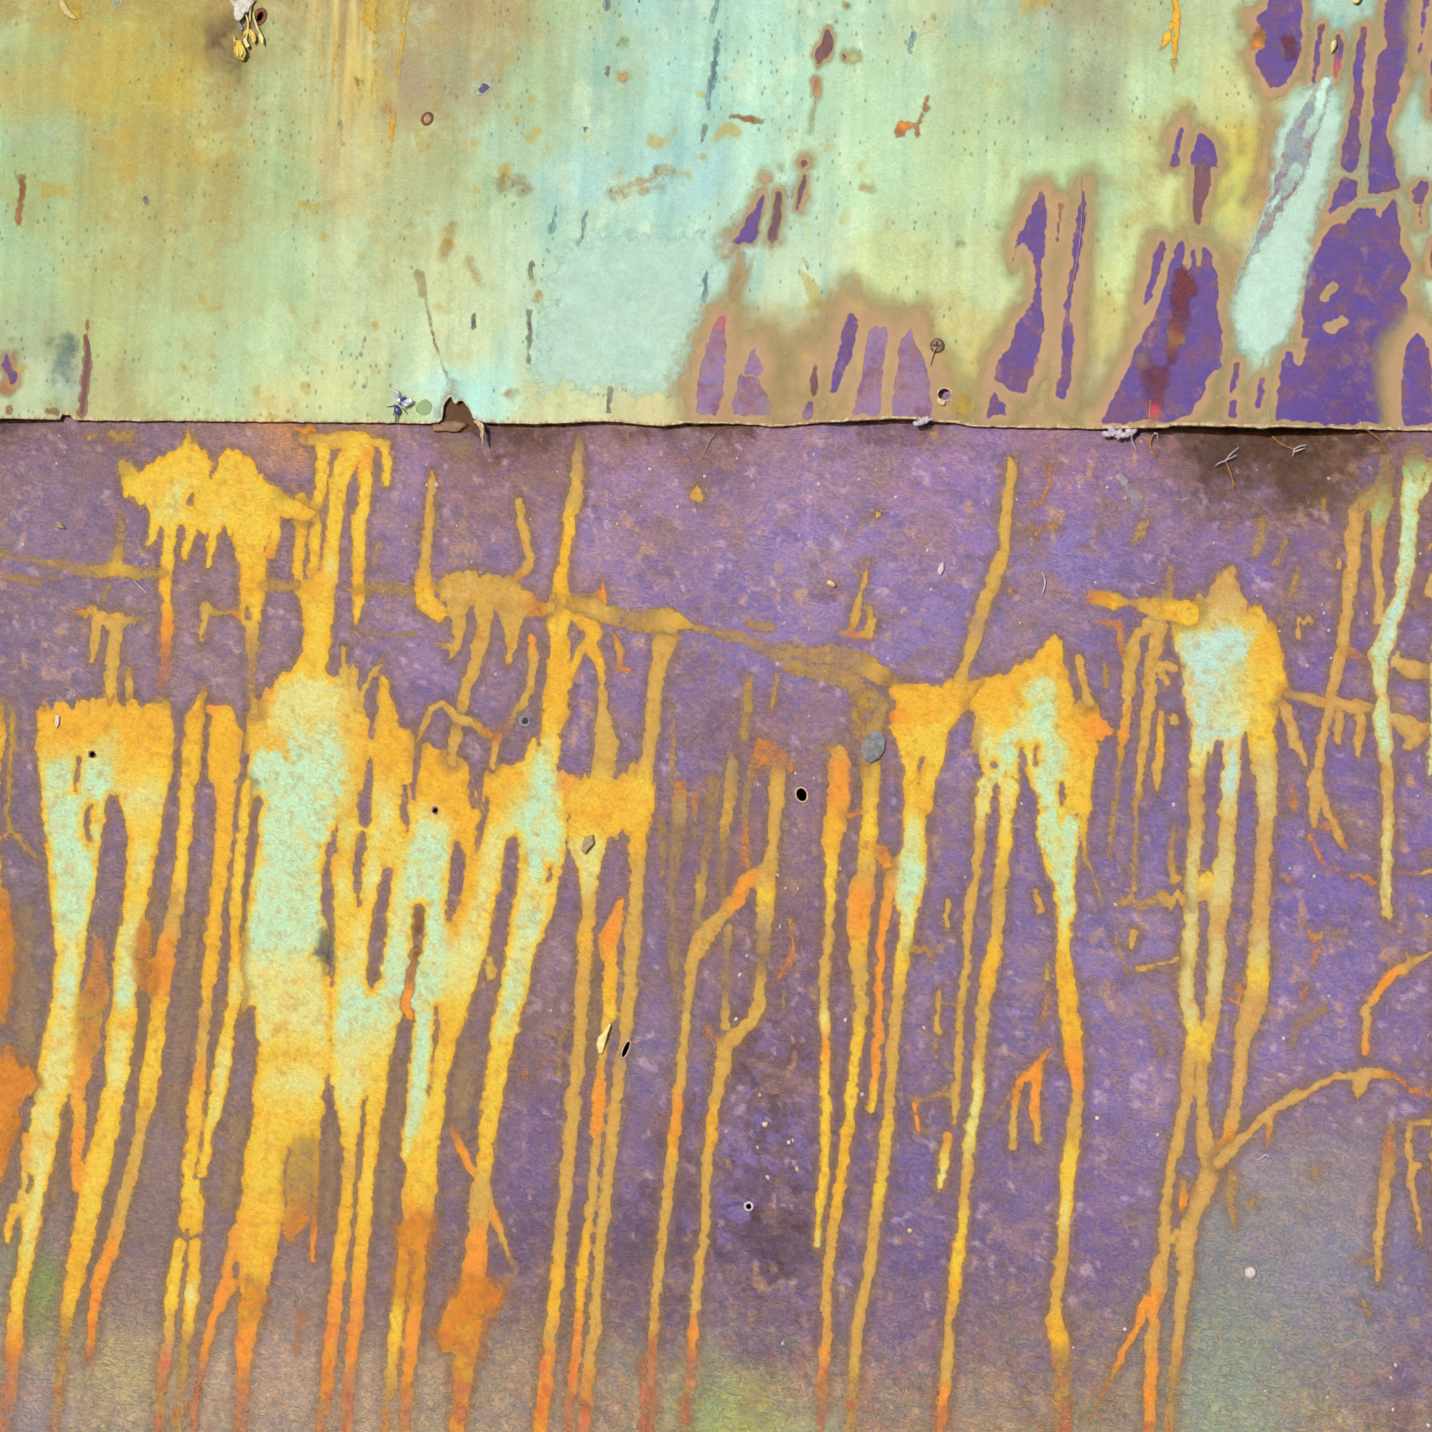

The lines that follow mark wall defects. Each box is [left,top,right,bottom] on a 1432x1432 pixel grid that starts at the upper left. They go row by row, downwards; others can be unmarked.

rust [1160,0,1181,60]
rust [730,114,761,124]
rust [894,96,930,137]
peeling [674,0,1432,429]
rust [399,910,424,1021]